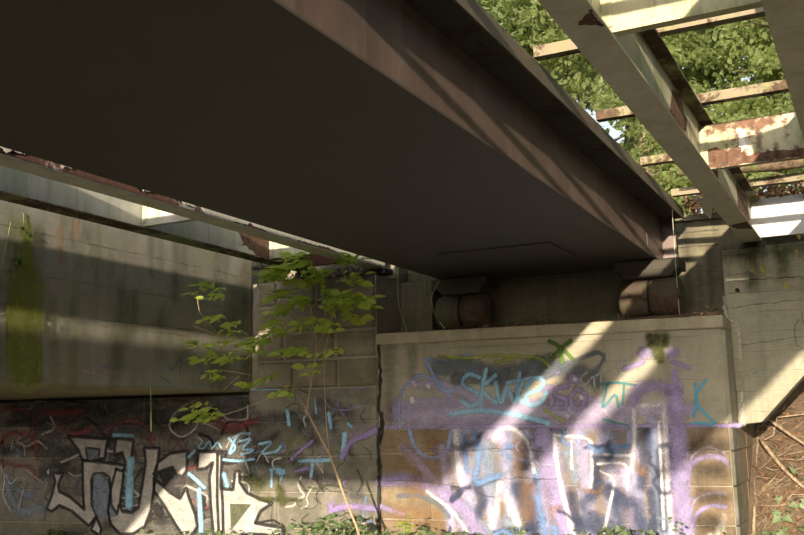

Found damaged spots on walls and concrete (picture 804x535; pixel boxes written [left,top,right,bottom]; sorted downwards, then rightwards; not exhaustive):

corrosion [708,128,804,168]
damp [6,221,45,390]
damp [646,333,670,363]
crack [376,345,544,535]